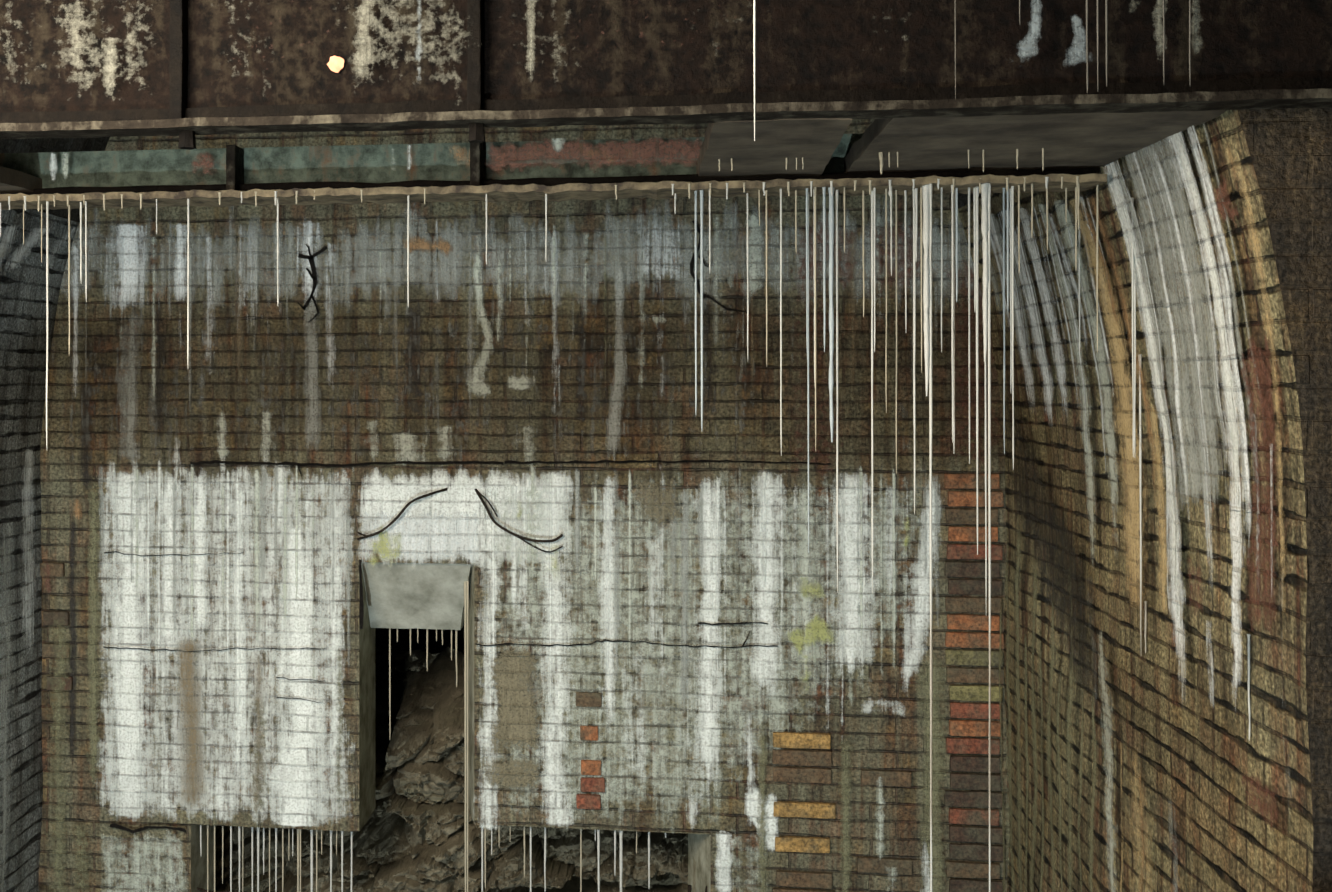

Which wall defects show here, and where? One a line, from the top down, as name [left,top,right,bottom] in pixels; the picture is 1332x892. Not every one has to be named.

rust [327,56,345,73]
crack [298,244,327,322]
crack [690,220,747,313]
damp [1104,126,1259,687]
damp [0,197,1117,892]